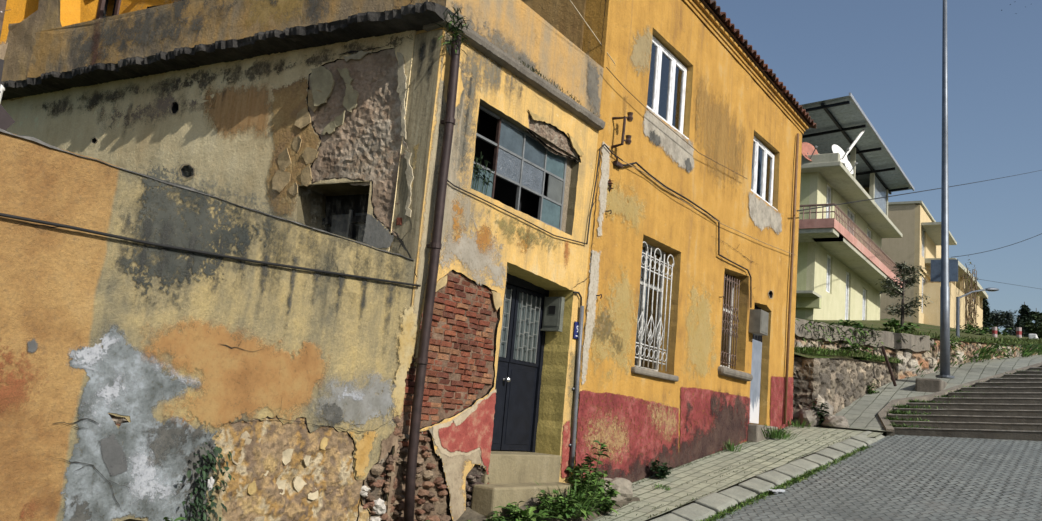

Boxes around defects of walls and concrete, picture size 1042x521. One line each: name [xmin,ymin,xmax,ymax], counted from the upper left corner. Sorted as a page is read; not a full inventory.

damp [42,42,373,137]
damp [119,160,298,313]
damp [300,233,368,308]
flaking render [213,30,503,521]
flaking render [109,414,127,426]
peeling [561,420,571,478]
peeling [587,419,629,460]